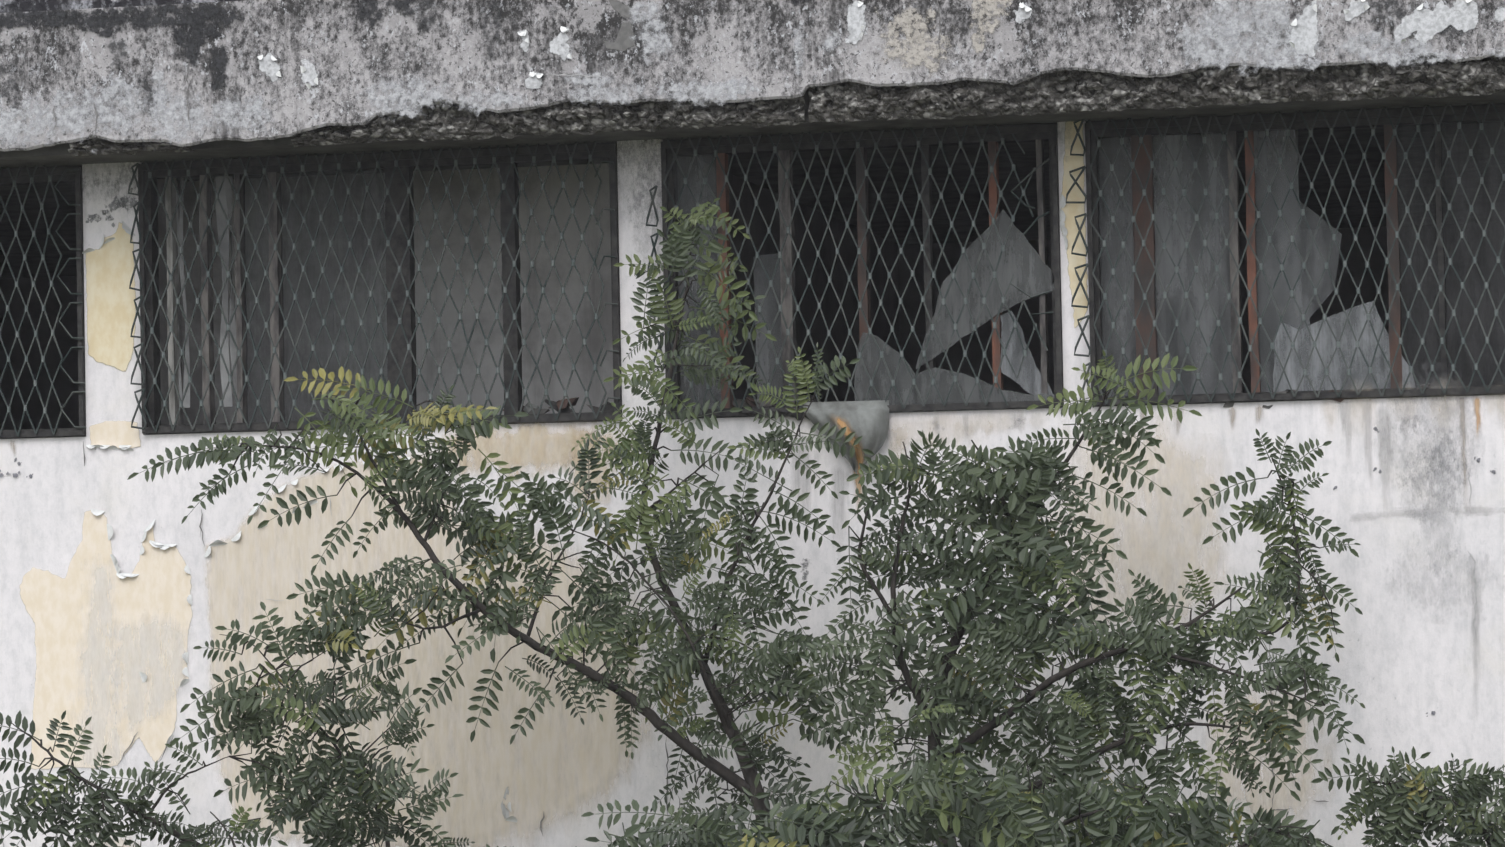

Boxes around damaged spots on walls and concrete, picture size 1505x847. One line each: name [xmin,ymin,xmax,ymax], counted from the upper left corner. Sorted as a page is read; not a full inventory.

mould [0,2,261,117]
mould [352,0,437,33]
mould [480,0,505,57]
spalling [291,0,1505,328]
peeling [82,221,136,371]
peeling [86,421,141,451]
water stain [1460,399,1496,477]
peeling [20,456,637,847]